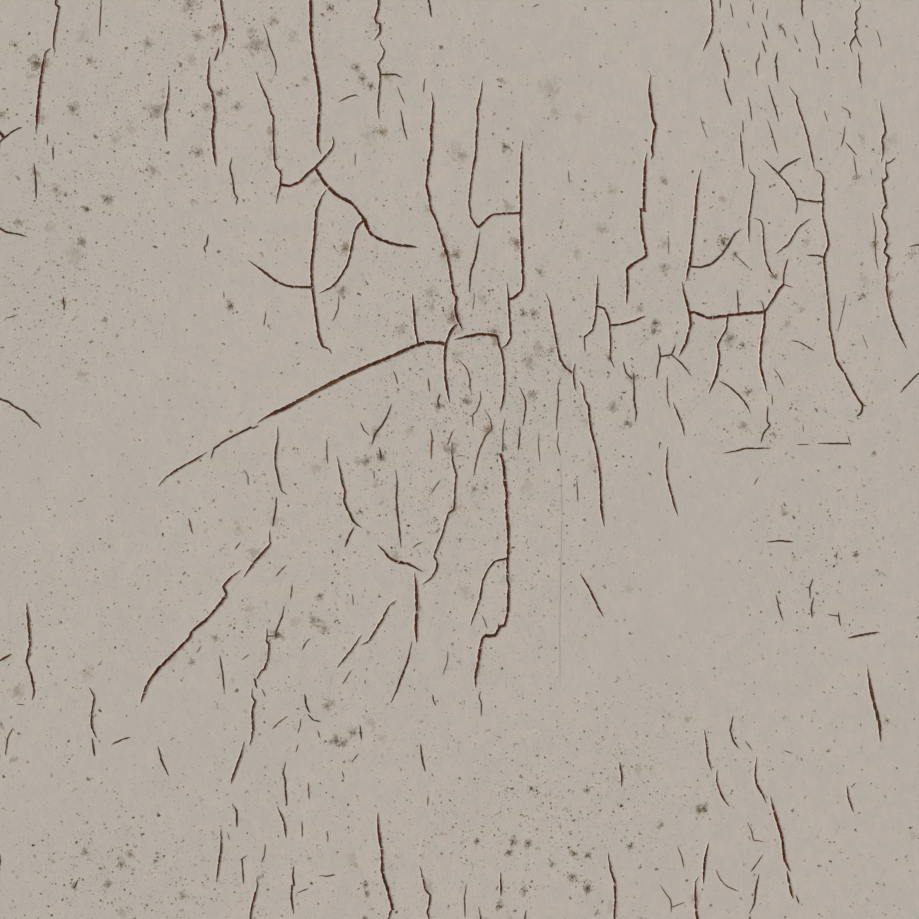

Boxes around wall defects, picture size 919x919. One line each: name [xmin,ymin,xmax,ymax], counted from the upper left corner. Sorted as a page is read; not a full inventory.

crack [0,0,60,197]
crack [0,227,28,237]
crack [140,0,907,712]
crack [0,397,41,429]
crack [0,602,35,705]
crack [230,566,321,838]
crack [867,668,882,742]
crack [216,805,265,919]
crack [290,866,335,914]
crack [376,813,395,919]
crack [419,865,432,919]
crack [660,717,799,919]